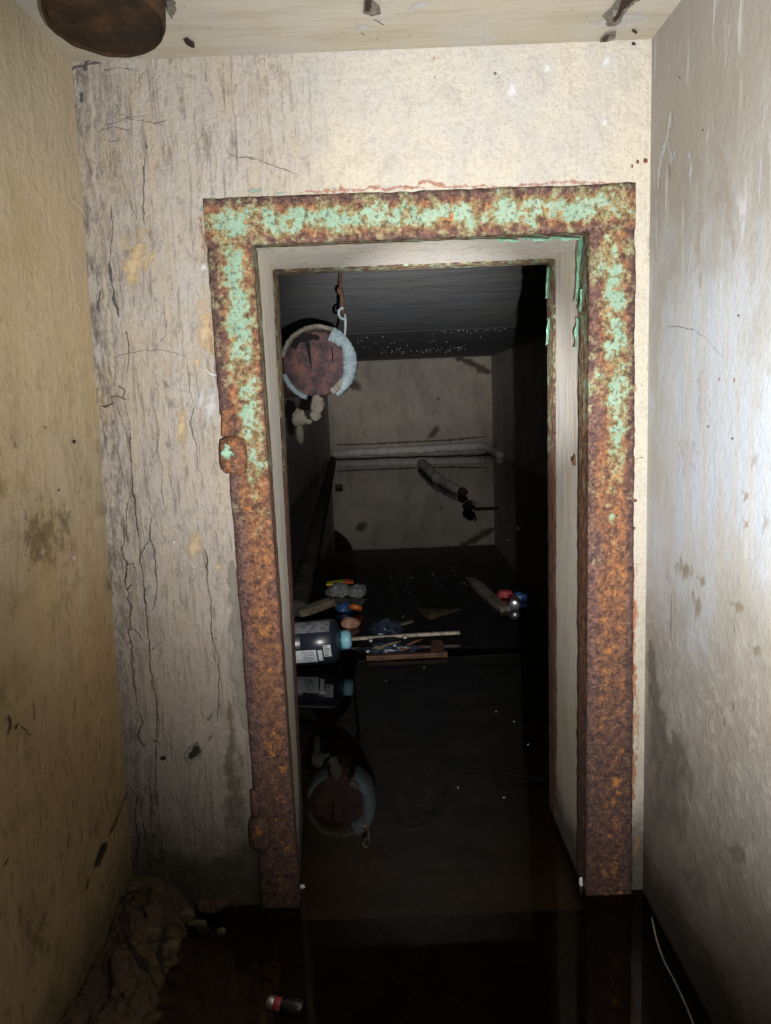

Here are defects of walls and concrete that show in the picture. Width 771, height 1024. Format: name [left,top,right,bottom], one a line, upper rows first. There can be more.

crack [72,60,134,103]
crack [230,154,291,172]
corrosion [302,180,615,193]
crack [96,113,203,863]
crack [205,548,220,719]